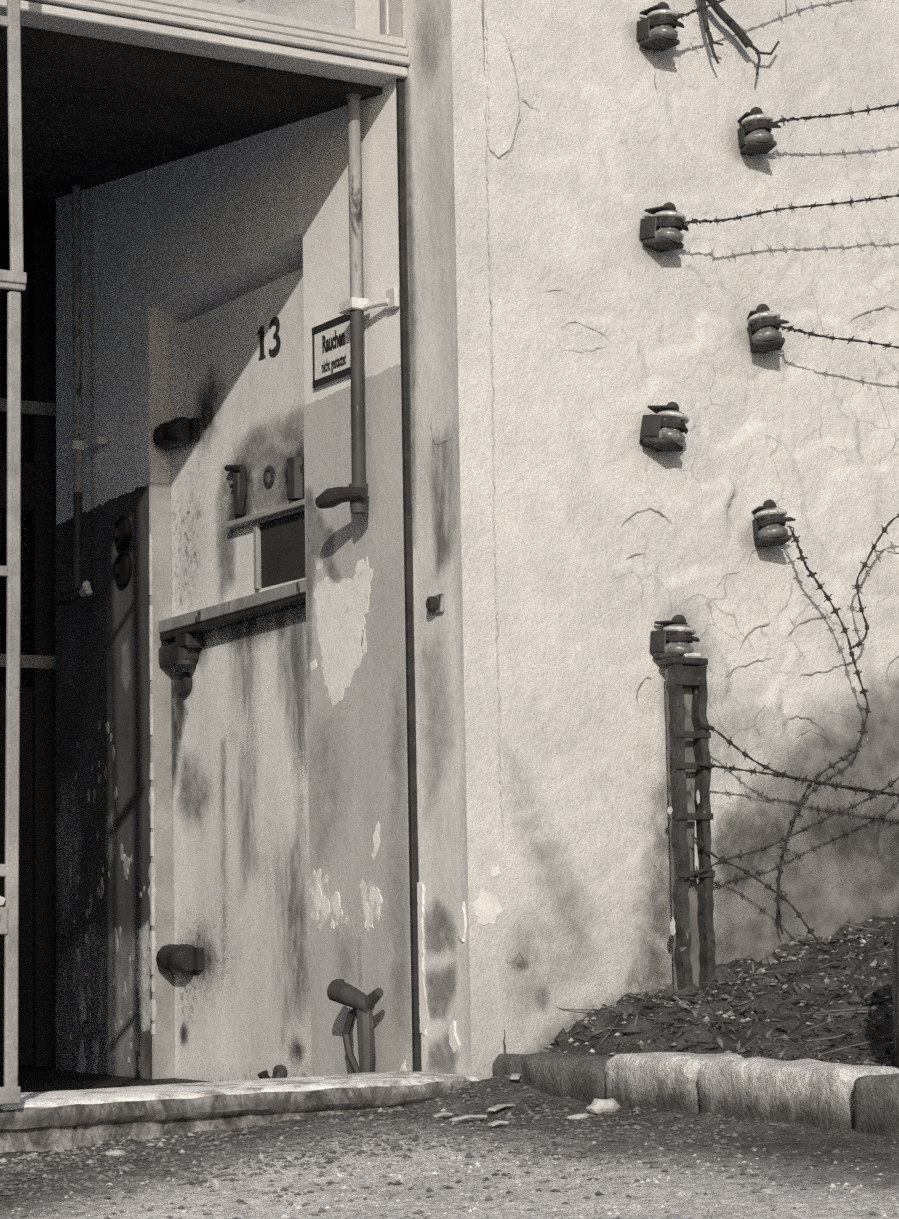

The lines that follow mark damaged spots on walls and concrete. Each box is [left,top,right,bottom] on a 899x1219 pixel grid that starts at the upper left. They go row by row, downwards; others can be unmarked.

crack [847,305,895,324]
crack [481,0,504,833]
water stain [231,612,304,752]
peeling [306,491,373,707]
crack [725,616,832,677]
crack [804,662,853,675]
peeling [57,763,157,1076]
water stain [288,868,303,993]
peeling [309,869,348,931]
peeling [360,880,382,931]
peeling [371,822,380,860]
water stain [714,702,899,964]